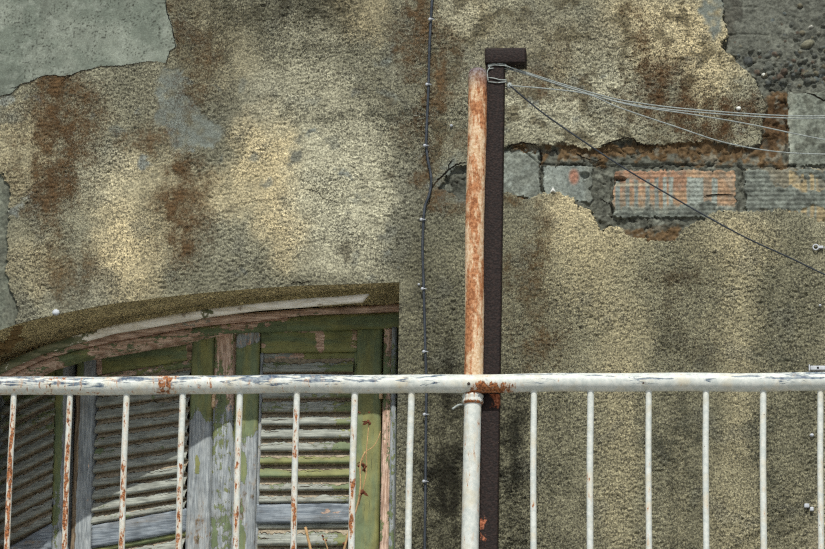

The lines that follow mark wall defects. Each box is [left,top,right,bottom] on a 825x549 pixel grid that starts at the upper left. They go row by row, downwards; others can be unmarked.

spalling [0,173,24,356]
spalling [439,165,467,201]
spalling [504,0,825,243]
water stain [500,393,531,503]